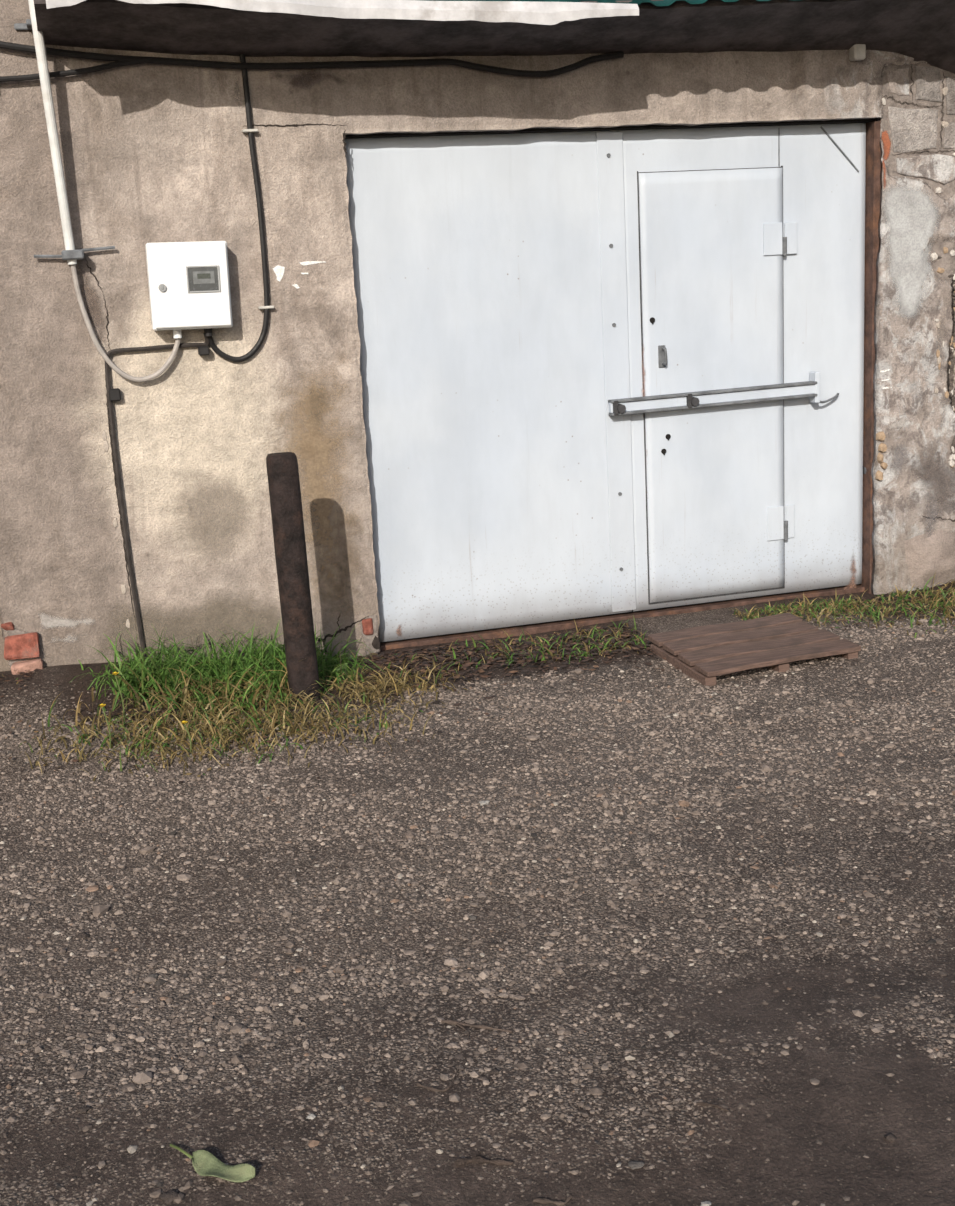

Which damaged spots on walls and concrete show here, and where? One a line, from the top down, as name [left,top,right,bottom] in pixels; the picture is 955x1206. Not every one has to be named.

flaking render [881,62,955,200]
spalling [1,622,44,675]